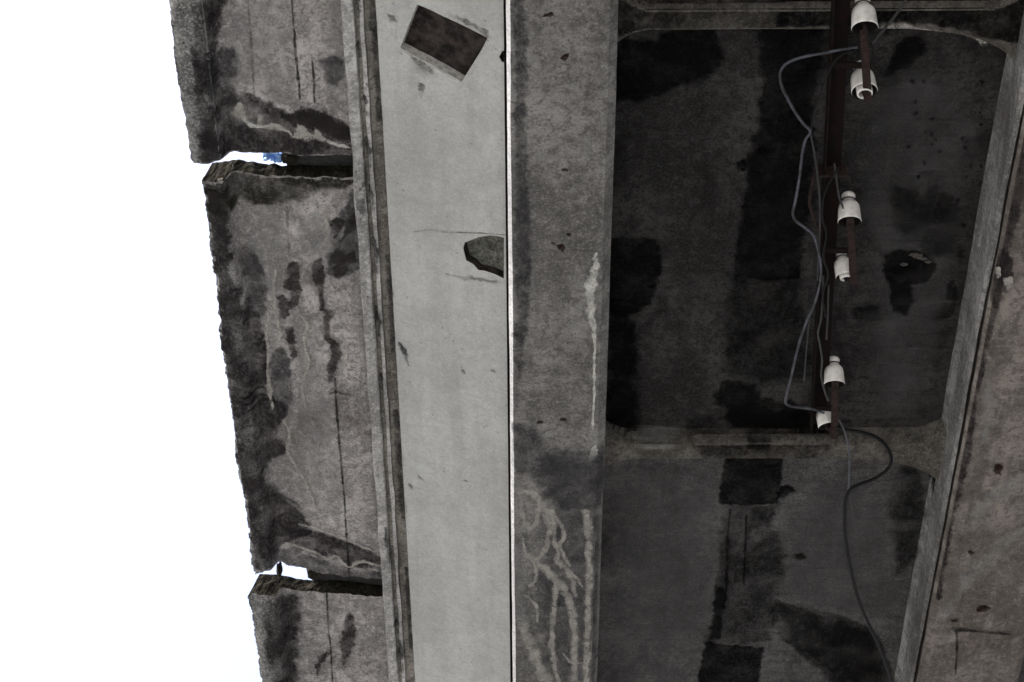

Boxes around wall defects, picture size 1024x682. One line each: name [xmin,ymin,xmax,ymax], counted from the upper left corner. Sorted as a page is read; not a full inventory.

crack [291,0,315,103]
leakage [871,0,1024,76]
leakage [205,178,382,580]
crack [329,378,350,571]
spalling [463,232,507,278]
leakage [513,424,604,682]
leakage [584,238,661,436]
leakage [694,0,888,682]